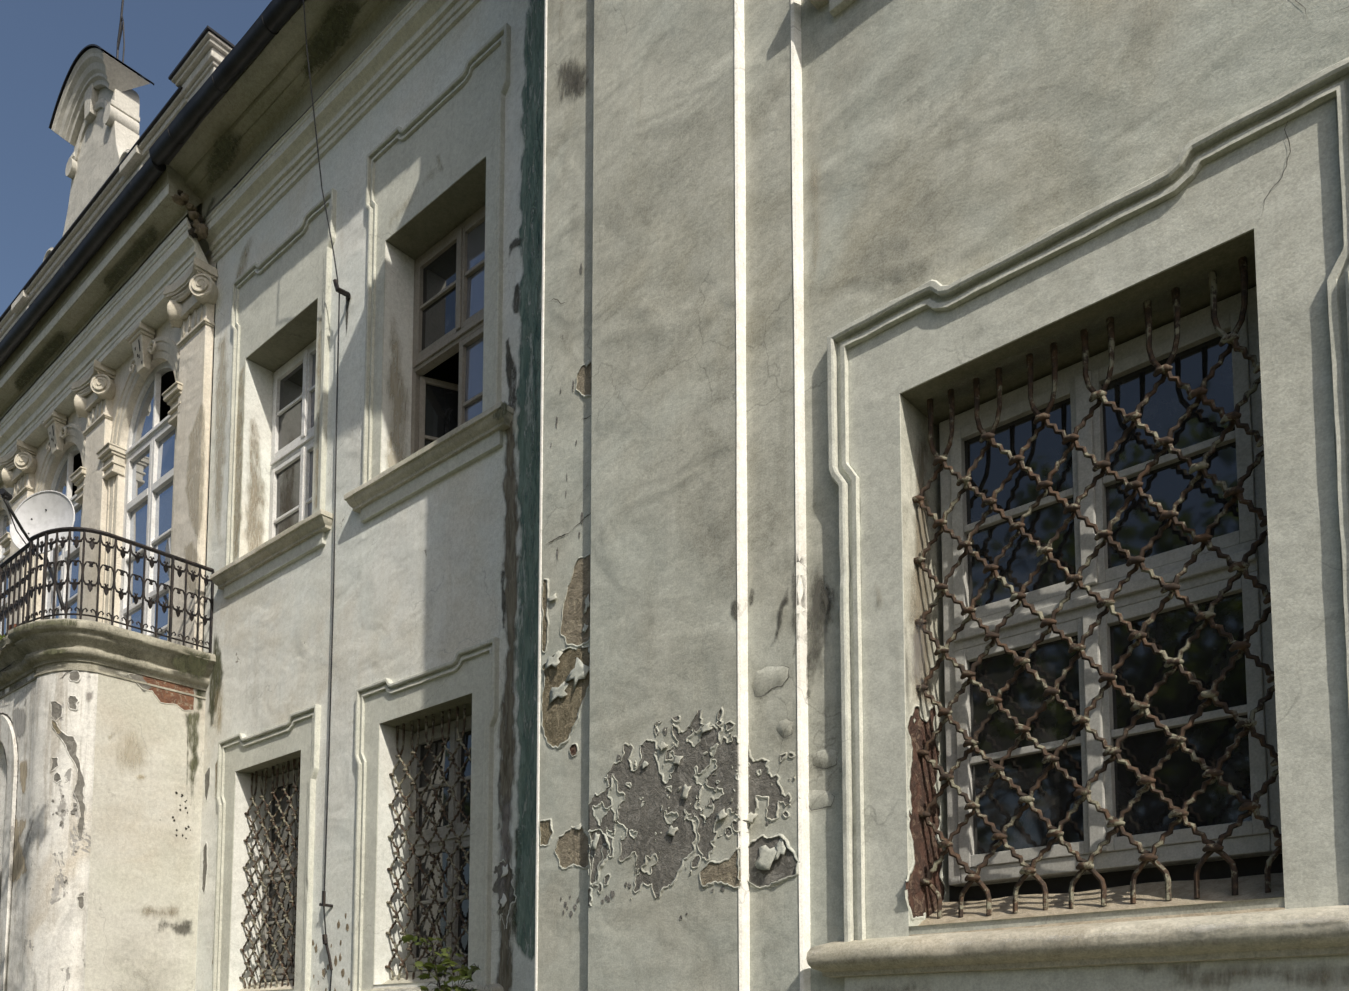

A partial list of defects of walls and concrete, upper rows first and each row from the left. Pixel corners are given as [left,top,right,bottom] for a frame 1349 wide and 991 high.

flaking render [560,360,592,399]
damp [493,0,587,991]
flaking render [127,673,195,711]
flaking render [541,553,590,757]
damp [776,558,834,669]
damp [0,820,26,904]
flaking render [49,670,87,852]
flaking render [492,857,517,929]
flaking render [539,707,800,917]
peeling [312,913,350,991]